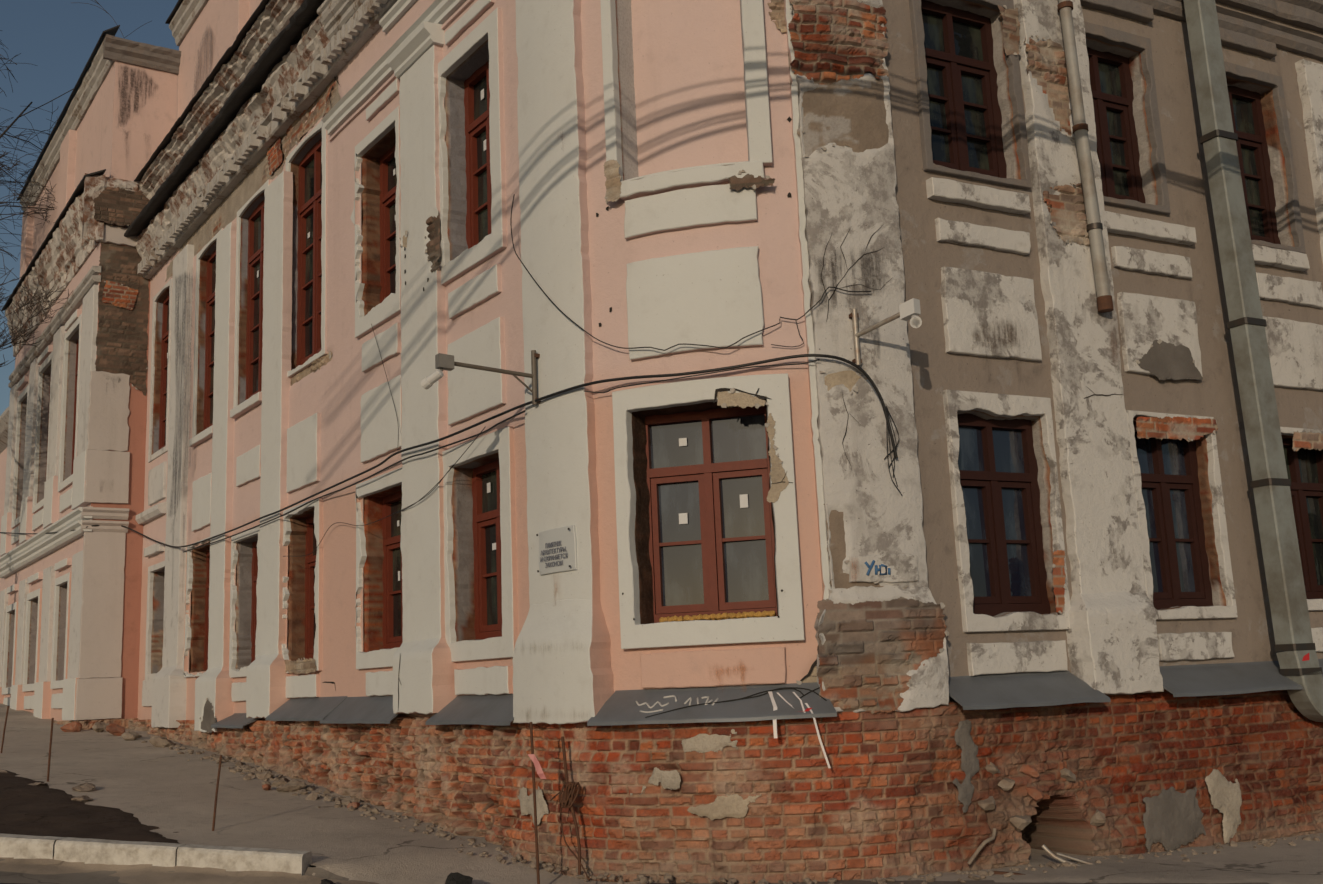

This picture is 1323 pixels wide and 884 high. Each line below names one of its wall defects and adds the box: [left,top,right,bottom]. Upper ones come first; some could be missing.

flaking render [768,0,890,161]
flaking render [998,5,1072,136]
flaking render [93,186,150,226]
flaking render [165,76,340,282]
flaking render [399,210,441,291]
flaking render [596,160,622,217]
flaking render [1043,182,1090,247]
flaking render [95,242,149,396]
flaking render [717,388,789,503]
flaking render [1136,416,1218,442]
flaking render [796,504,949,715]